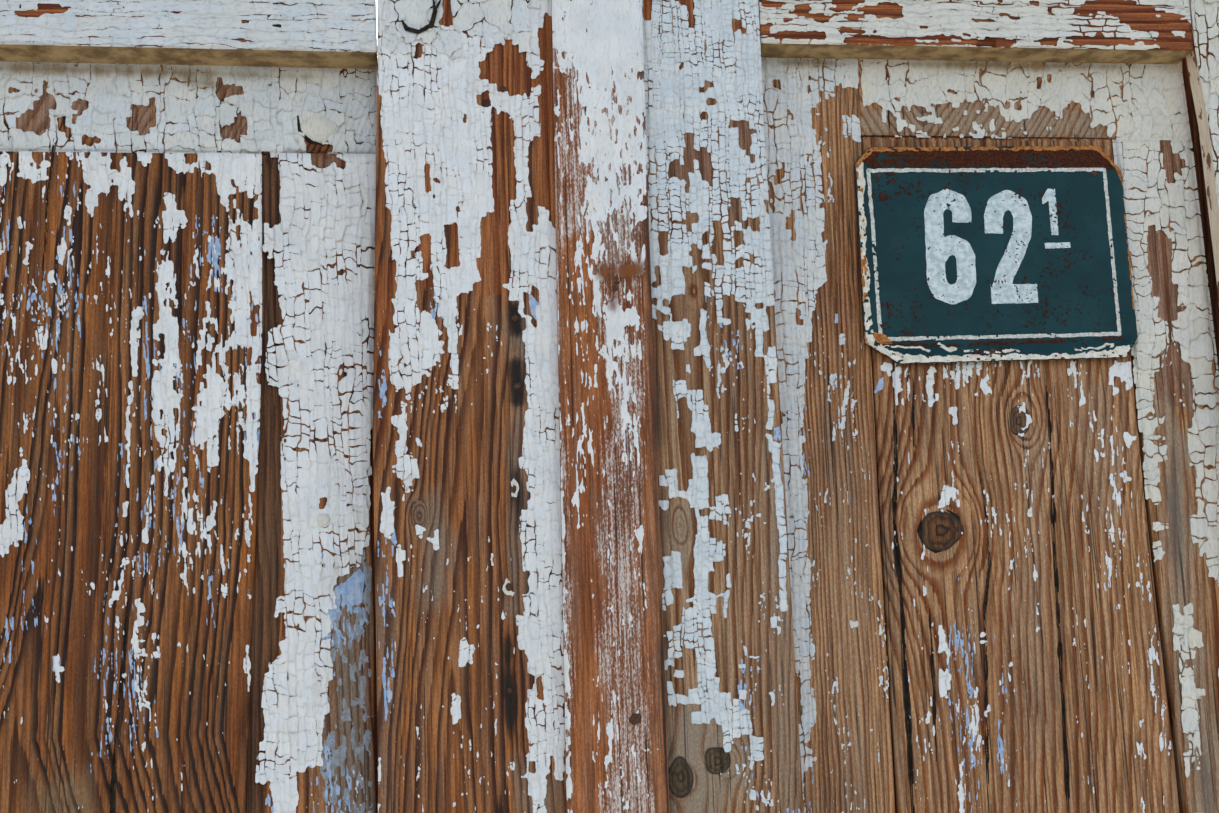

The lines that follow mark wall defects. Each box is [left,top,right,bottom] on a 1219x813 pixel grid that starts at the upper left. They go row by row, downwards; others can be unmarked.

crack [0,0,441,79]
crack [39,95,65,311]
crack [297,115,322,144]
rust [855,145,1134,360]
peeling [0,447,44,557]
peeling [442,693,489,807]
peeling [448,585,486,667]
peeling [659,364,779,811]
peeling [874,361,1001,425]
peeling [908,608,1028,813]
peeling [980,360,1050,591]
peeling [1134,603,1216,777]